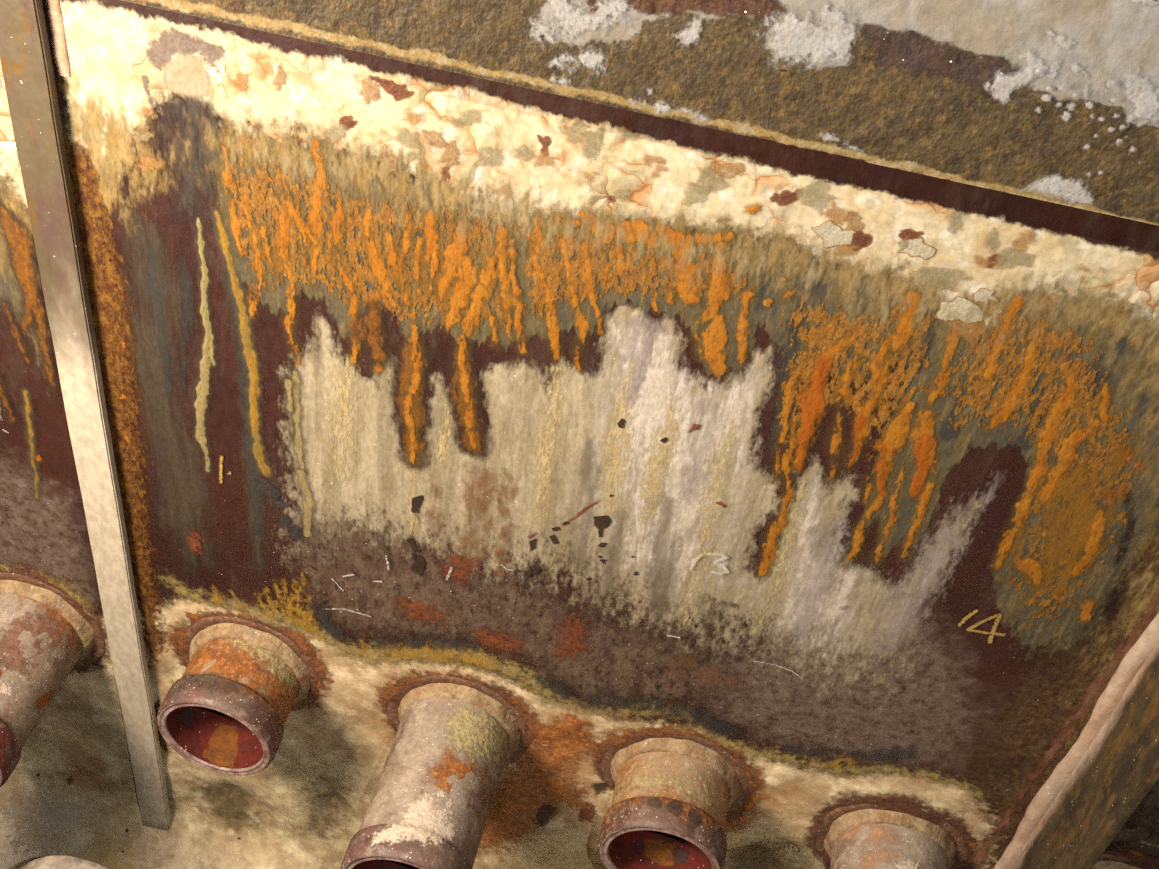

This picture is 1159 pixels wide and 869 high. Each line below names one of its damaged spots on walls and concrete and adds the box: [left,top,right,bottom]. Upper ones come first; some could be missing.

peeling [60,0,1159,342]
leakage [0,175,50,378]
leakage [22,389,42,499]
leakage [66,100,215,570]
rust [64,136,333,723]
peeling [411,495,423,513]
rust [285,519,736,710]
peeling [528,522,568,551]
peeling [593,515,611,564]
leakage [162,120,1159,869]
rust [218,139,1148,627]
rust [378,669,767,854]